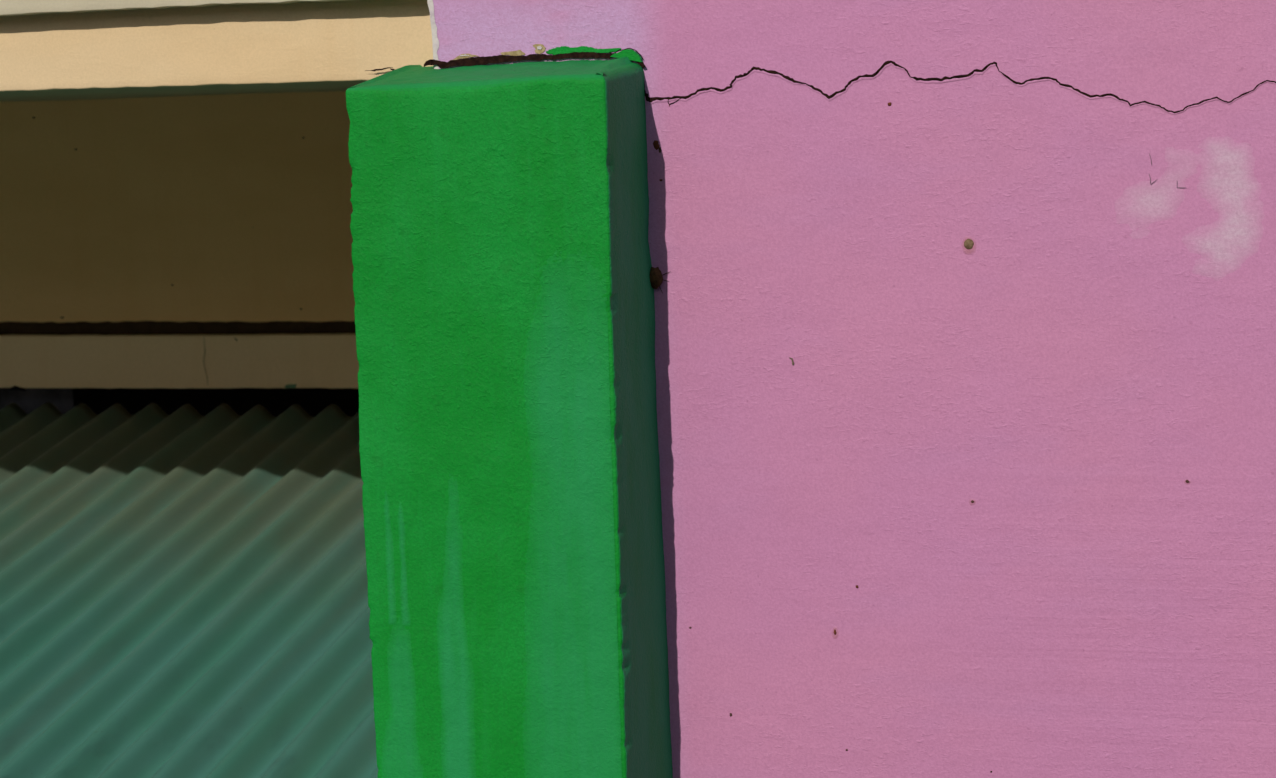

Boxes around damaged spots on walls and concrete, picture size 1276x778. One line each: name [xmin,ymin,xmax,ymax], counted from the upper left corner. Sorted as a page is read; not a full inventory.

crack [364,48,1276,115]
water stain [1114,136,1265,281]